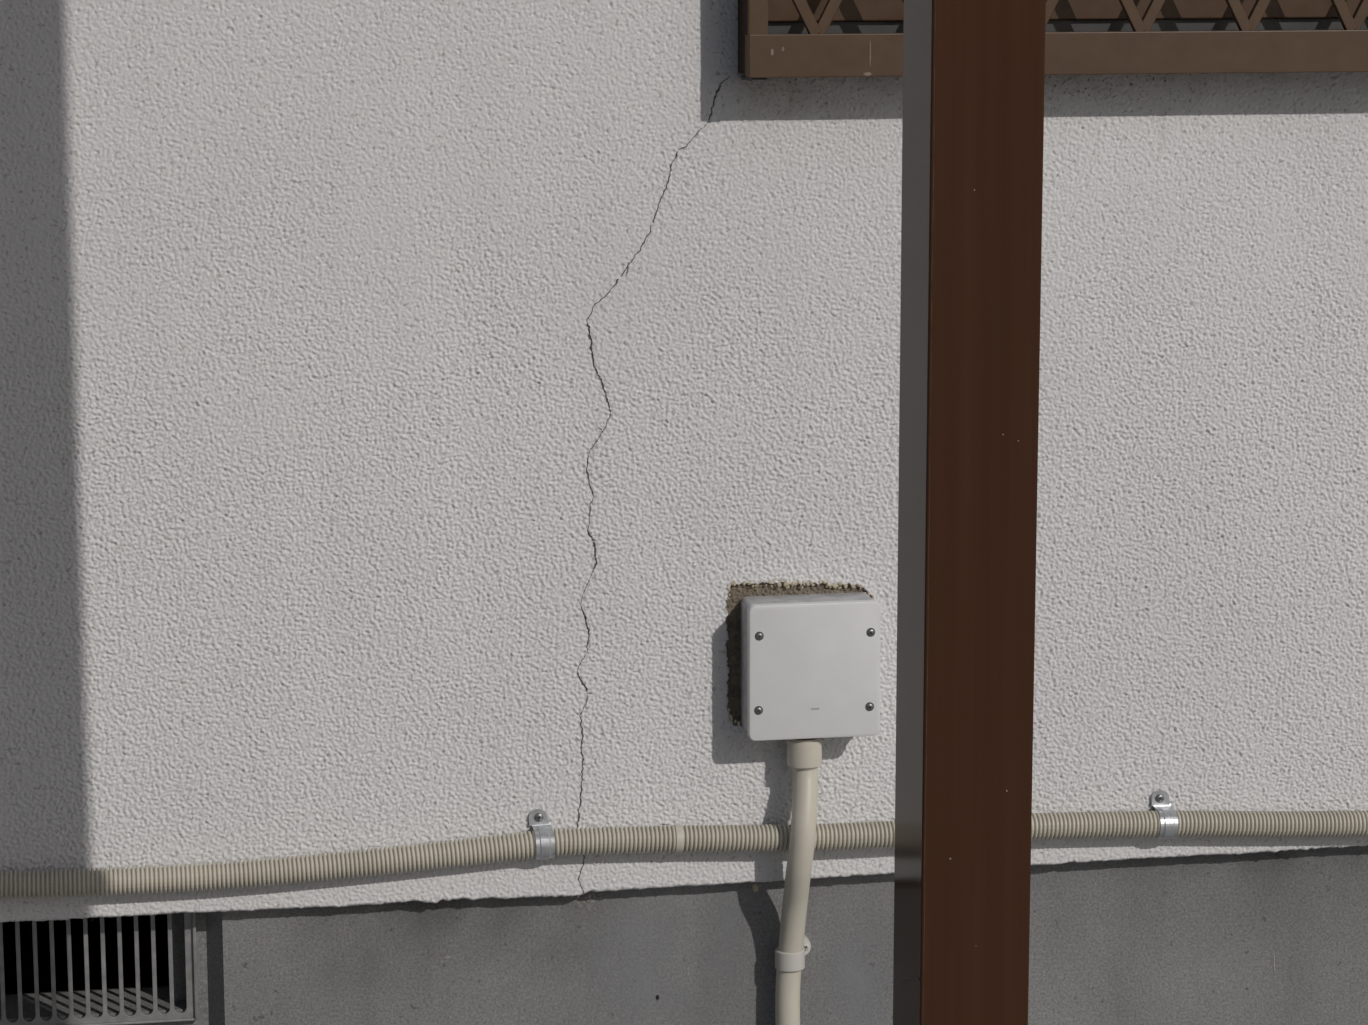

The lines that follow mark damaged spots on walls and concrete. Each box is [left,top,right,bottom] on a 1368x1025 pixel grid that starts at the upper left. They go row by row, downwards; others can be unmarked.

crack [576,76,730,895]